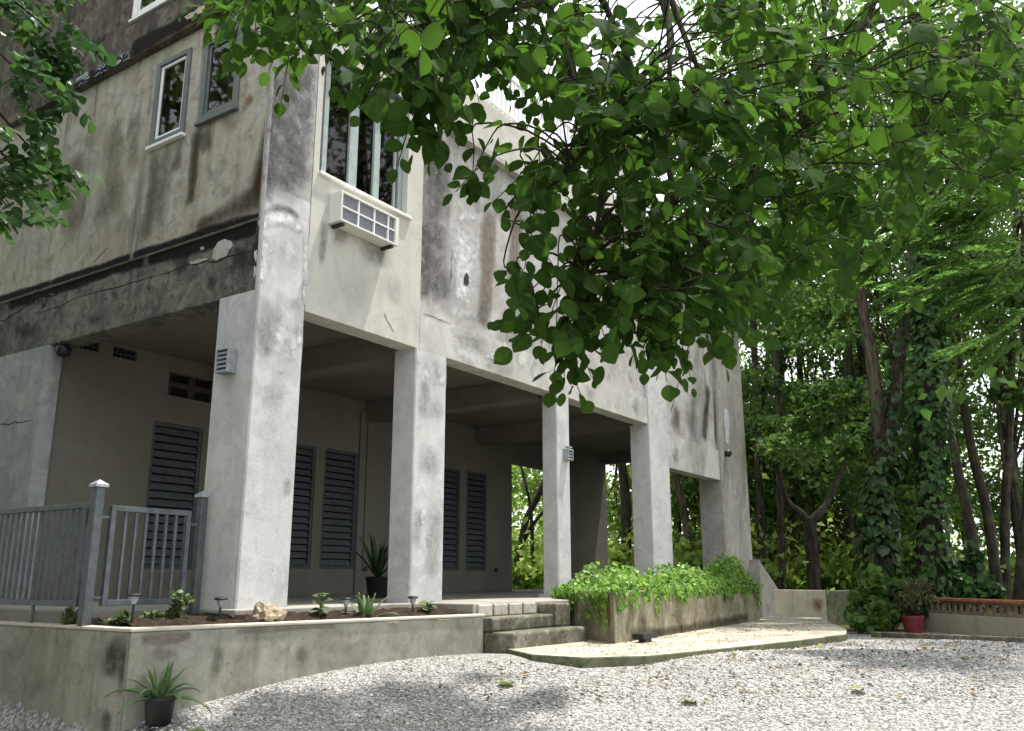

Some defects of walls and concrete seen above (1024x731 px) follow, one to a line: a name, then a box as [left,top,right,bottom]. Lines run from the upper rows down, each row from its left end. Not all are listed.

crack [0,251,254,321]
leakage [0,60,314,309]
spalling [189,239,233,264]
leakage [421,161,448,297]
leakage [480,214,494,324]
leakage [703,387,717,440]